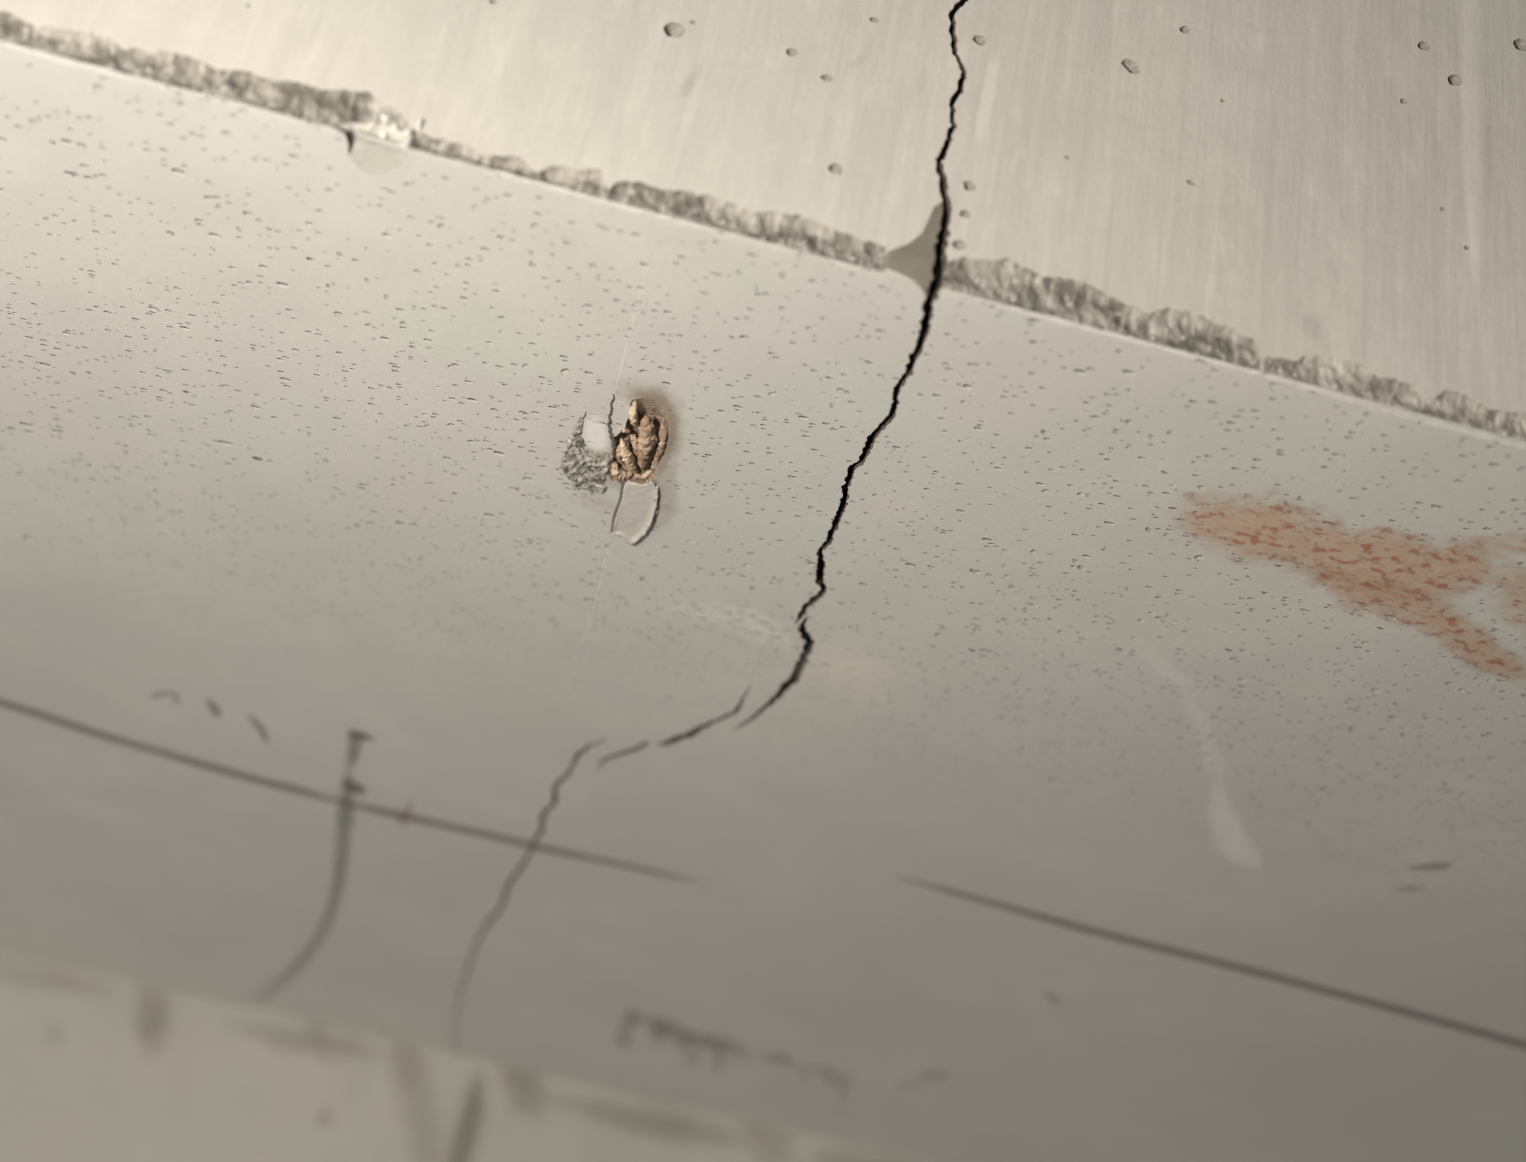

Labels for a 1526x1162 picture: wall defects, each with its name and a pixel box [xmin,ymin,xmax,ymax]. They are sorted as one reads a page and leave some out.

spalling [0,11,890,273]
spalling [941,256,1526,441]
spalling [561,395,668,546]
crack [453,0,968,1056]
corrosion [1194,504,1519,672]